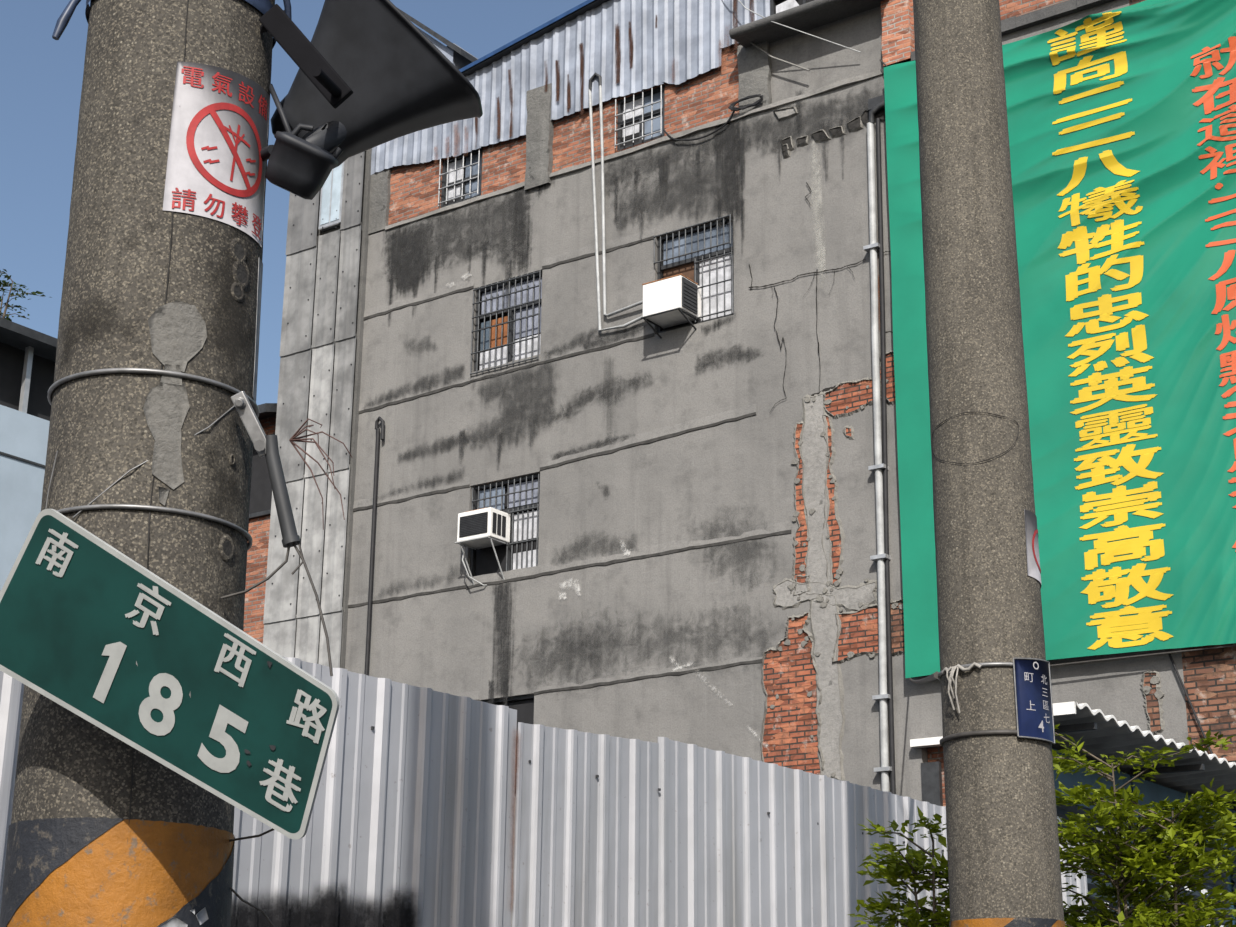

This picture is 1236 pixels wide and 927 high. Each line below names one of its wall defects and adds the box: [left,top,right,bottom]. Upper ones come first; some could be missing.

rust [496,70,513,139]
rust [545,43,584,114]
rust [615,22,633,83]
water stain [605,90,870,245]
rust [733,0,754,49]
water stain [386,183,546,318]
water stain [399,327,643,461]
crack [749,251,891,412]
water stain [418,472,461,486]
flaking render [760,350,905,781]